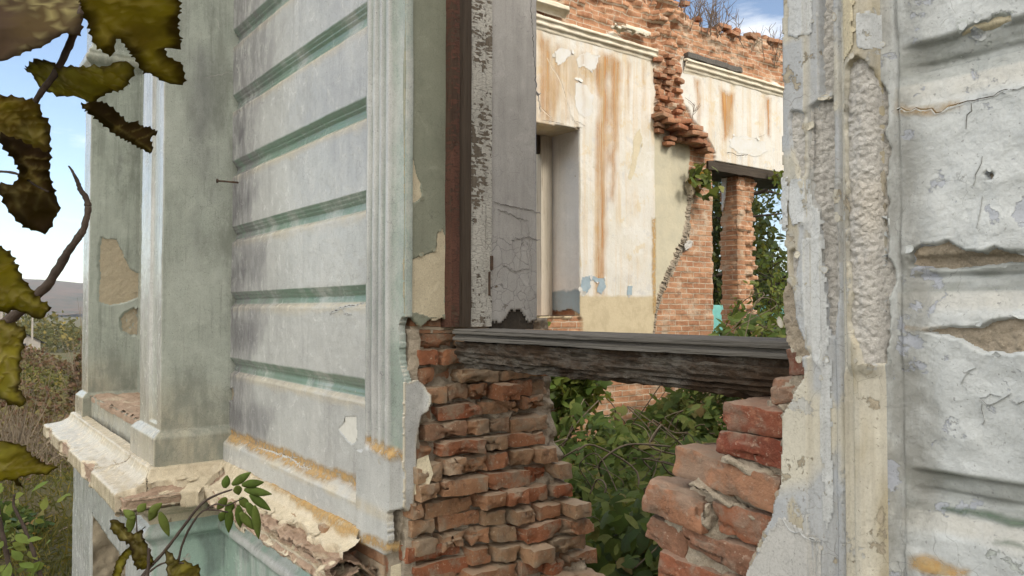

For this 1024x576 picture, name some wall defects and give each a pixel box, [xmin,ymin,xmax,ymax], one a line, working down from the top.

peeling [552,47,600,117]
crack [896,86,1024,129]
corrosion [598,56,619,286]
spalling [99,236,138,337]
peeling [402,229,445,321]
crack [494,201,541,308]
spalling [746,0,897,576]
spalling [905,242,1024,269]
spalling [114,463,378,576]
peeling [339,416,358,444]
peeling [414,455,433,495]
peeling [391,563,401,576]